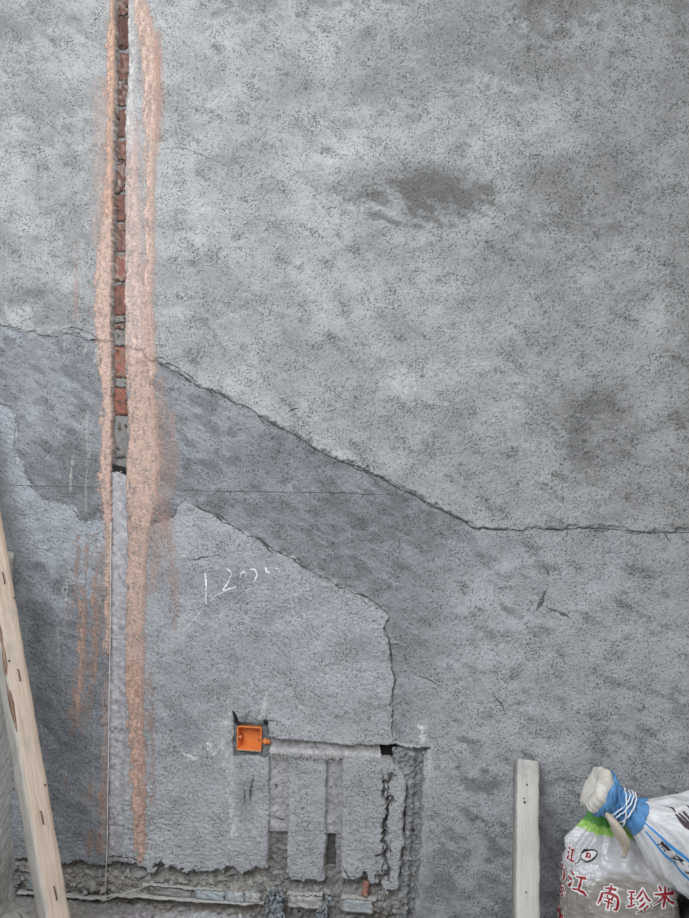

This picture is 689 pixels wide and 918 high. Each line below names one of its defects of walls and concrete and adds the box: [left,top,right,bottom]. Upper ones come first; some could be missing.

crack [0,325,113,343]
crack [0,403,99,521]
crack [135,348,689,740]
crack [375,771,391,872]